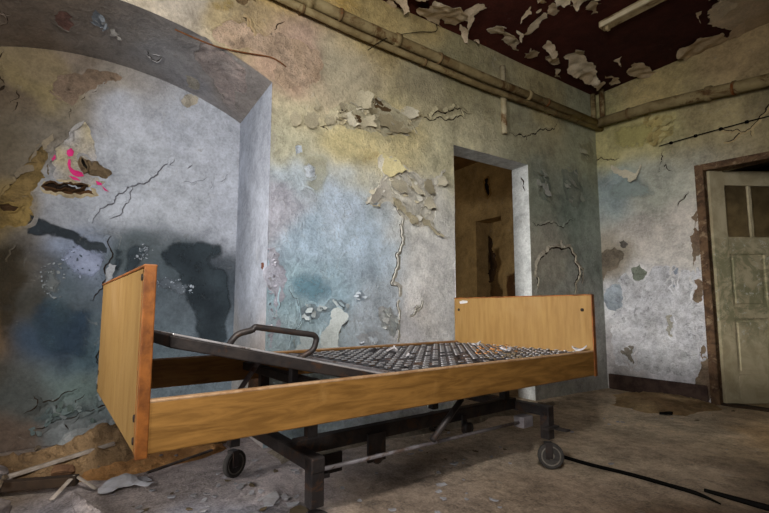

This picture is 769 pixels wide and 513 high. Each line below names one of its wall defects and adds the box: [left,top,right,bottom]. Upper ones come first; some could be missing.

spalling [189,0,425,140]
peeling [386,0,486,45]
peeling [486,0,620,91]
peeling [676,0,769,61]
spalling [0,120,118,234]
leakage [28,215,145,272]
crack [88,157,229,301]
leakage [161,242,231,342]
crack [366,169,446,342]
peeling [364,150,451,239]
crack [532,218,584,295]
spalling [601,207,711,403]